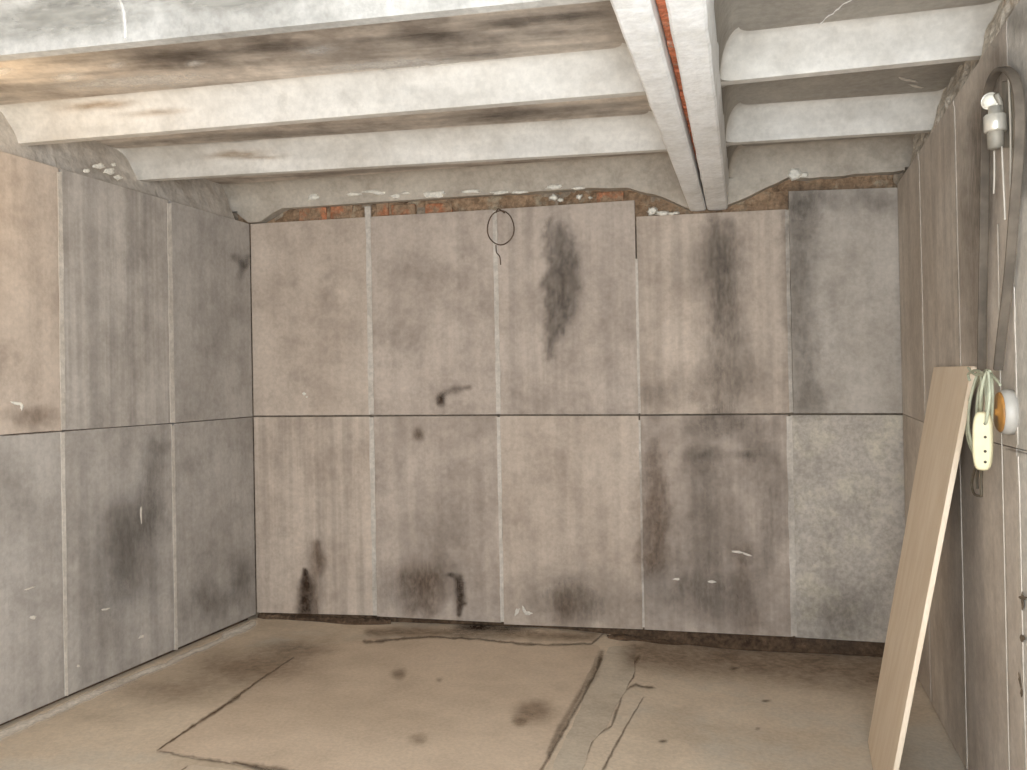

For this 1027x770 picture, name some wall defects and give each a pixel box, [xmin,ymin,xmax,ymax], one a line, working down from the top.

crack [819,0,852,24]
spalling [910,0,1020,164]
spalling [346,190,410,199]
leakage [299,569,312,618]
leakage [410,572,517,631]